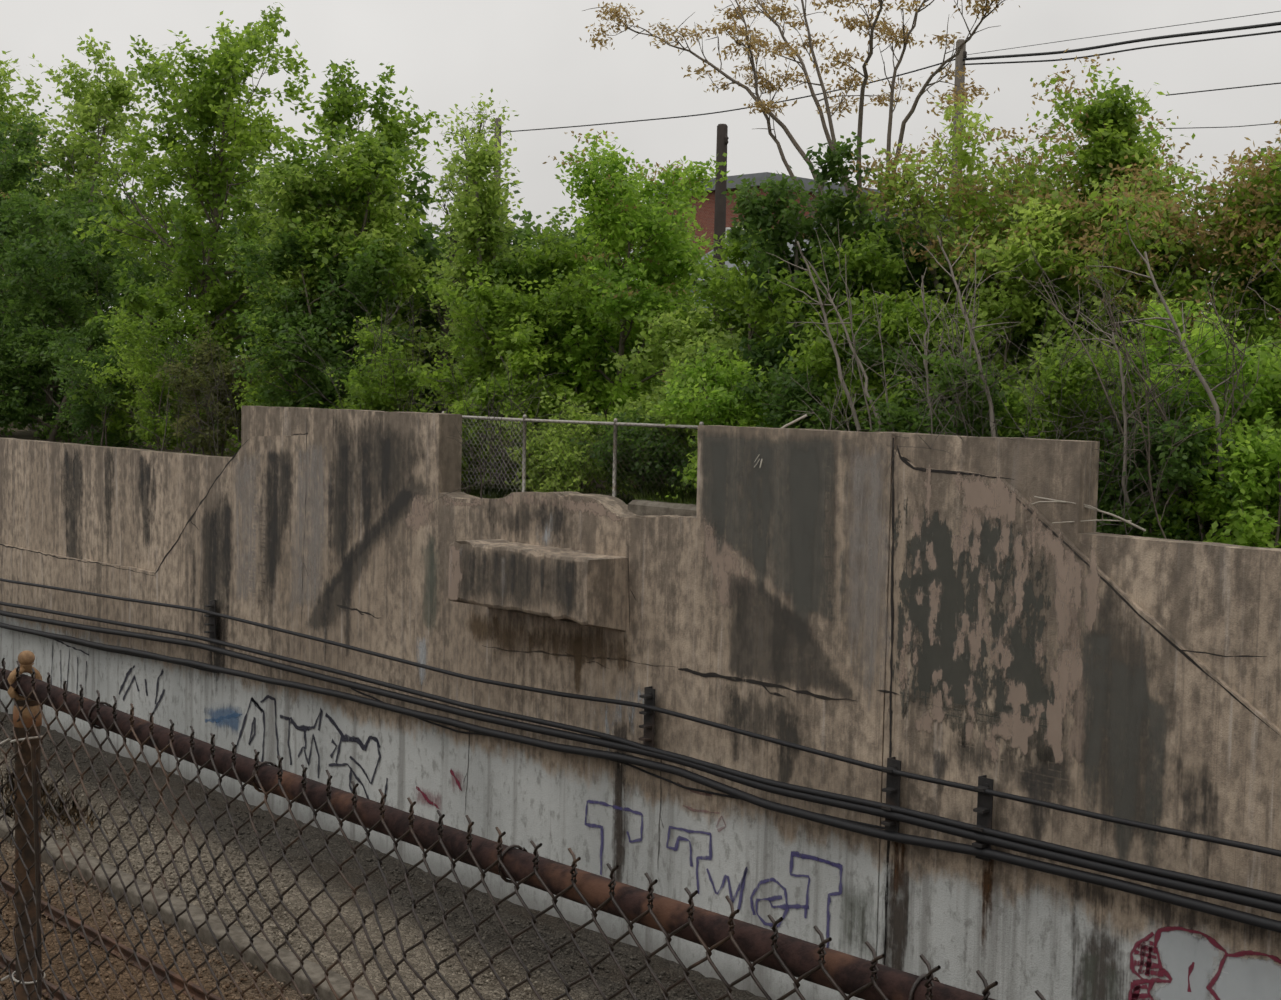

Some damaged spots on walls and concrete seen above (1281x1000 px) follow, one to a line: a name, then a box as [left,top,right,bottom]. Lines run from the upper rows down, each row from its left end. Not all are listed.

leakage [61,453,82,560]
leakage [105,452,114,542]
leakage [139,458,156,543]
leakage [324,439,411,653]
spalling [406,494,621,531]
crack [484,438,1279,758]
crack [883,840,891,965]